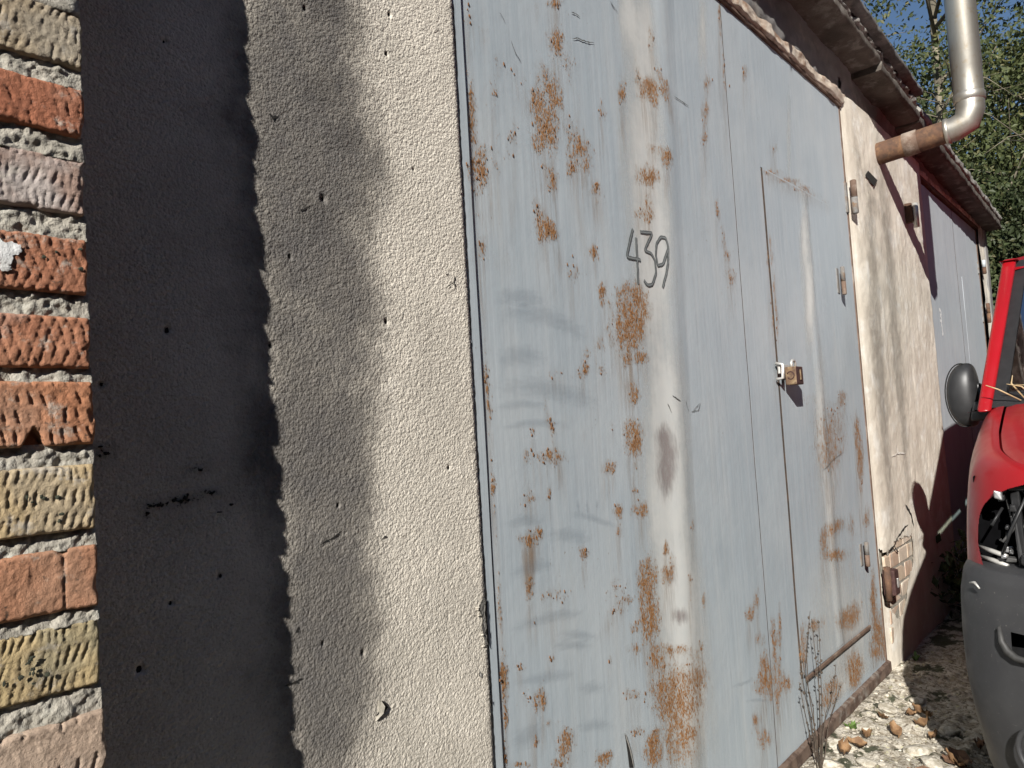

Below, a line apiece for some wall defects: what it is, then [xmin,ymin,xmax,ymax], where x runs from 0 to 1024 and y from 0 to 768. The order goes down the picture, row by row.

corrosion [466,71,518,195]
corrosion [495,24,605,243]
corrosion [618,67,672,108]
corrosion [634,145,673,223]
corrosion [578,279,649,379]
corrosion [612,383,643,469]
water stain [620,0,705,763]
corrosion [809,391,865,491]
corrosion [599,540,713,768]
corrosion [752,616,794,714]
corrosion [799,568,885,712]
spalling [882,533,913,644]